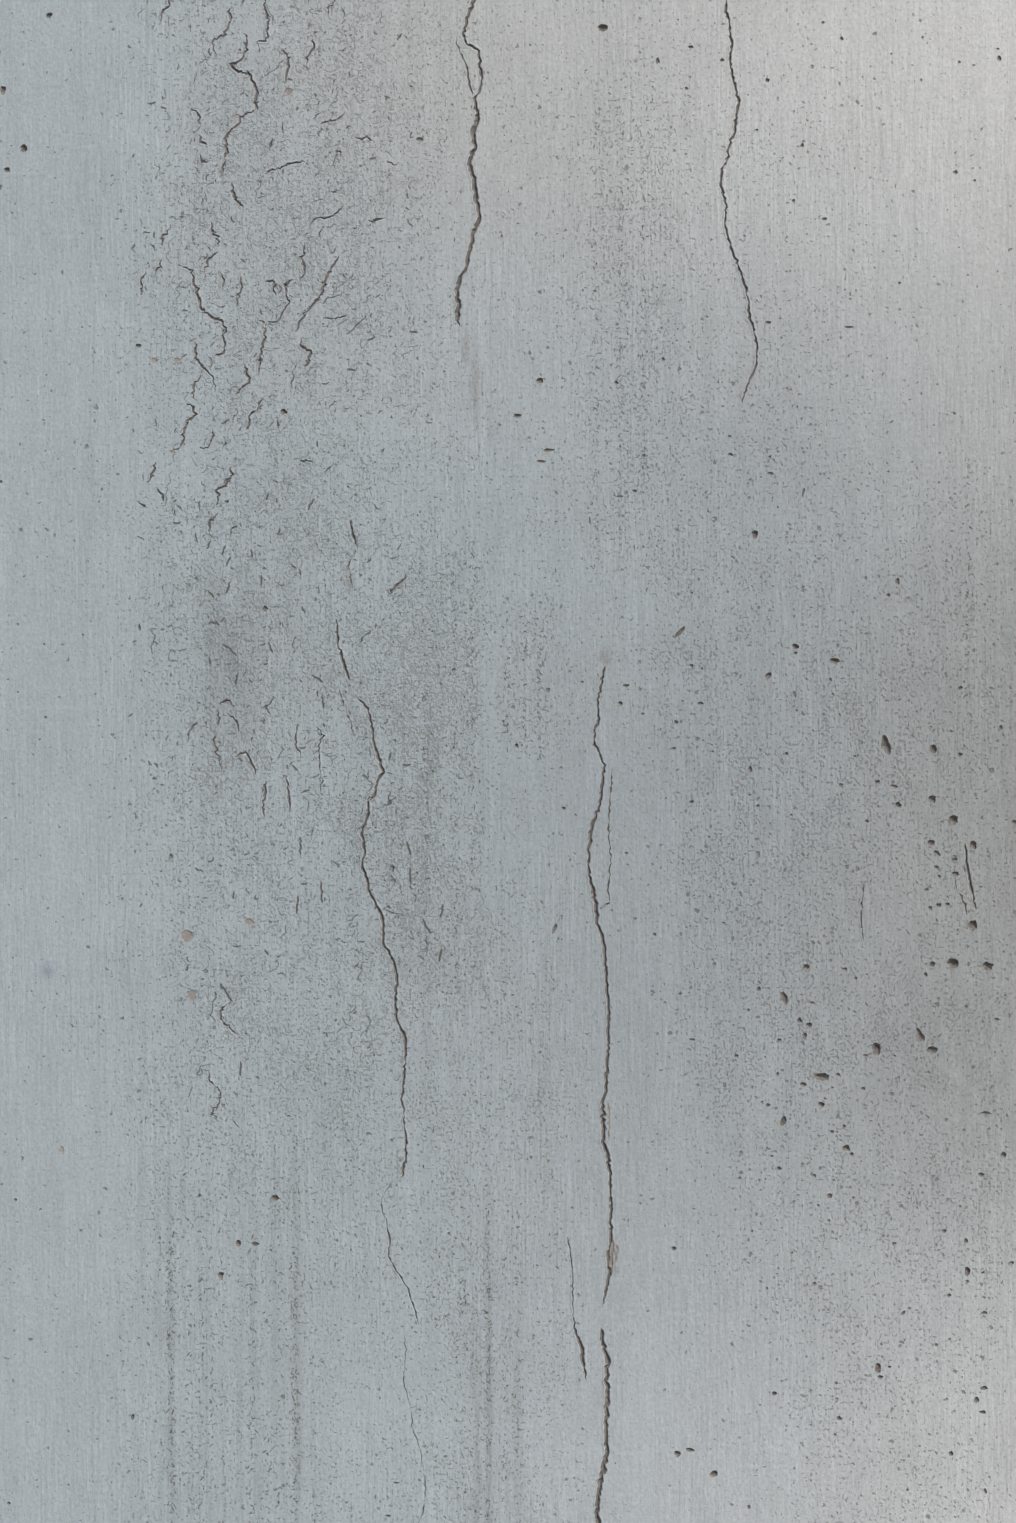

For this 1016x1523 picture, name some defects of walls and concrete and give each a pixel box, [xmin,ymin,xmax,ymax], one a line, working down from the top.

crack [70,0,804,1523]